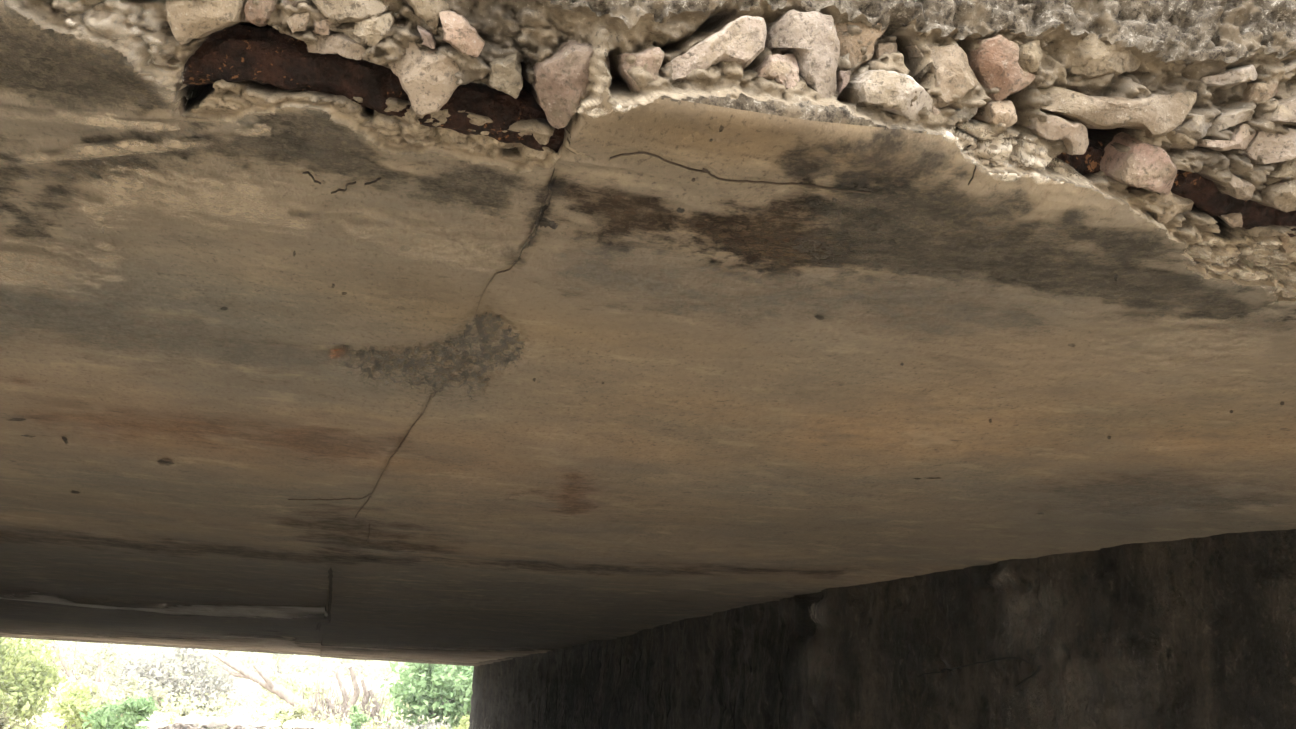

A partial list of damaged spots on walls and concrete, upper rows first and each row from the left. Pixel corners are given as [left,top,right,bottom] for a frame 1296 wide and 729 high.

leakage [0,8,170,112]
leakage [0,109,523,292]
spalling [3,0,636,173]
crack [462,168,555,339]
crack [610,151,871,194]
leakage [510,125,1296,340]
spalling [905,23,1296,303]
crack [288,375,457,542]